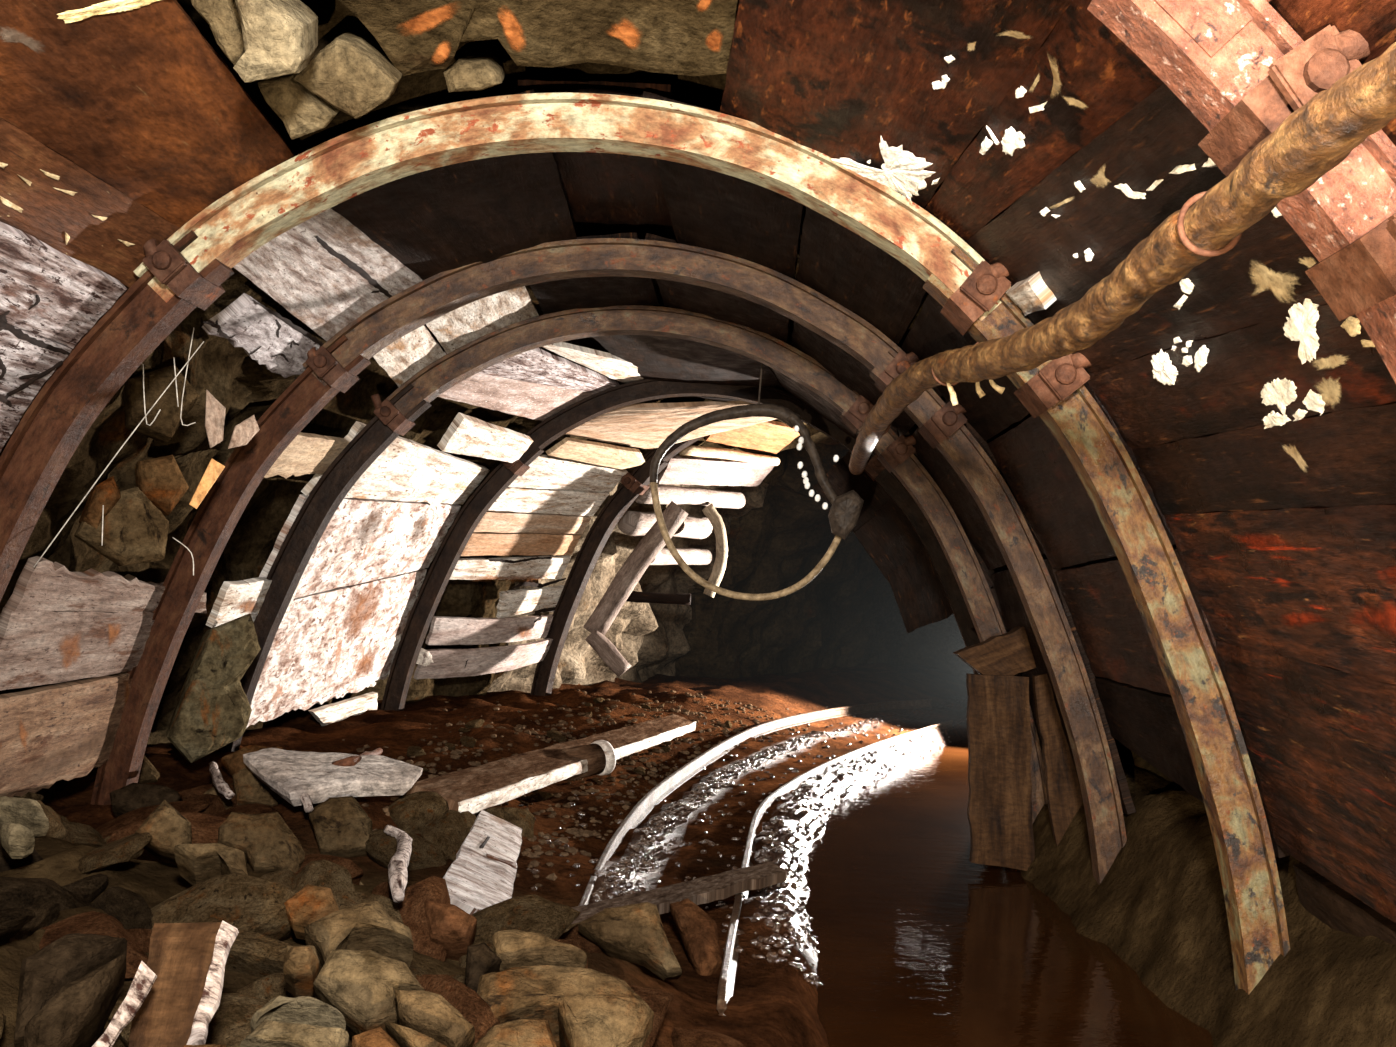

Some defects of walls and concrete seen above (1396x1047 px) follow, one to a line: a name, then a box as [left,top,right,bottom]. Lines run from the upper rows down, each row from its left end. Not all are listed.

peeling [57,0,159,23]